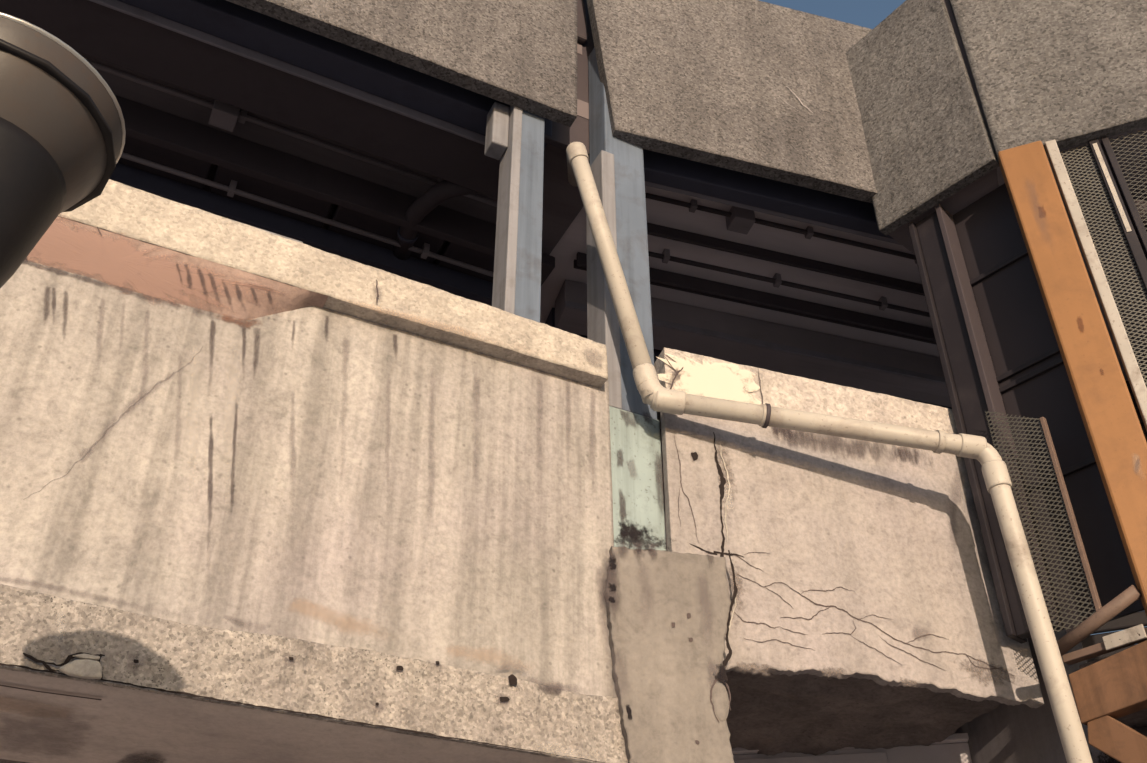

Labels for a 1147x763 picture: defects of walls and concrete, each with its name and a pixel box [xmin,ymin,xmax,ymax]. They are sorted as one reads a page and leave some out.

leakage [606,520,673,606]
crack [674,432,1014,680]
spalling [59,653,102,680]